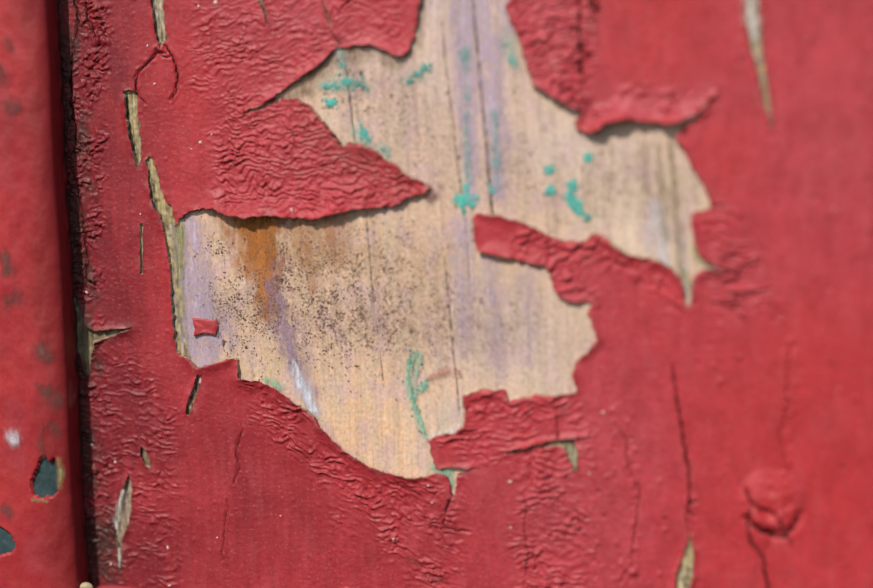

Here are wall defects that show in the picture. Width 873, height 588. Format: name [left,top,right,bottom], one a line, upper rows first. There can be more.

peeling [745,0,772,127]
corrosion [235,215,281,319]
peeling [125,0,718,495]
peeling [0,527,15,555]
peeling [33,456,60,498]
peeling [114,477,132,570]
crack [672,366,696,530]
peeling [676,538,694,588]
crack [747,527,770,588]